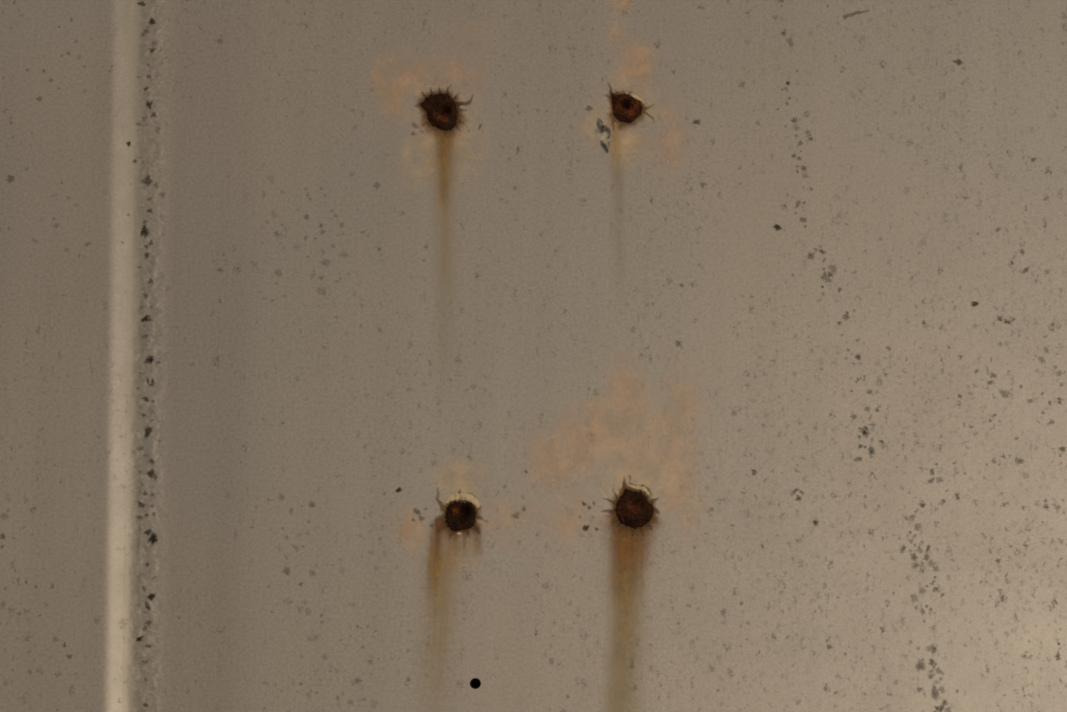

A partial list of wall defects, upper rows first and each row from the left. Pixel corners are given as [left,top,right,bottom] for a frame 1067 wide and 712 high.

rust [419,89,471,178]
rust [610,87,648,131]
rust [433,492,480,580]
rust [608,476,658,635]